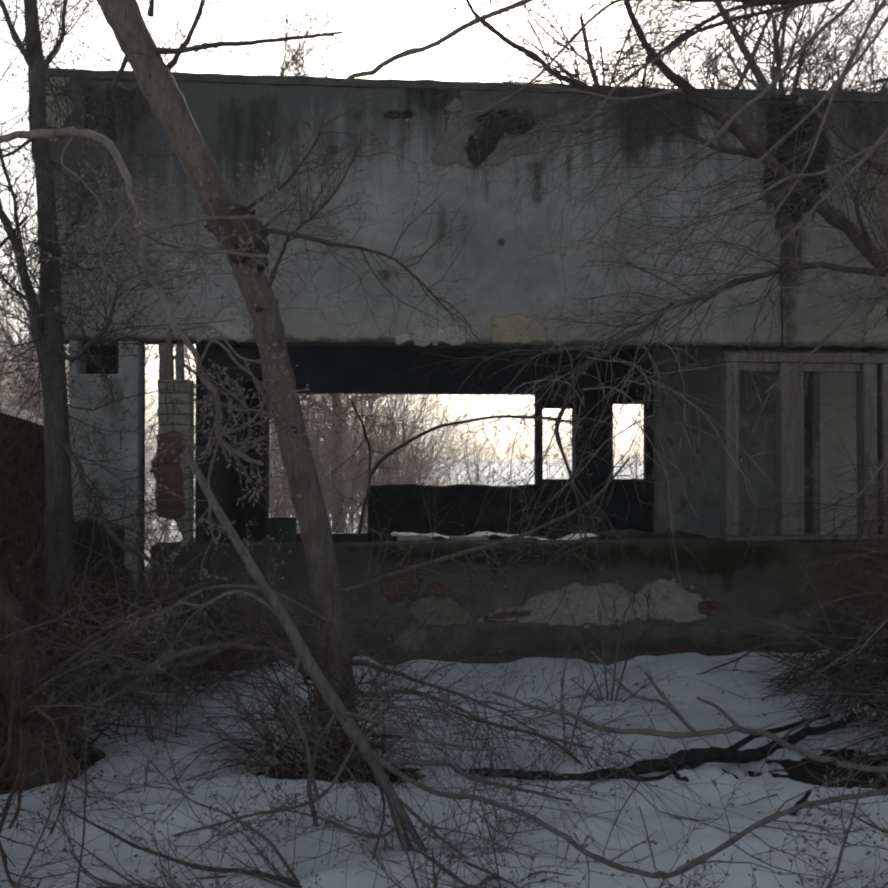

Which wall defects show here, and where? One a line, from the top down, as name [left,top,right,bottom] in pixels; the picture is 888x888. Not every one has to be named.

spalling [465,108,536,167]
damp [762,95,830,229]
spalling [394,323,478,347]
peeling [491,314,549,344]
spalling [149,430,185,521]
spalling [478,579,720,628]